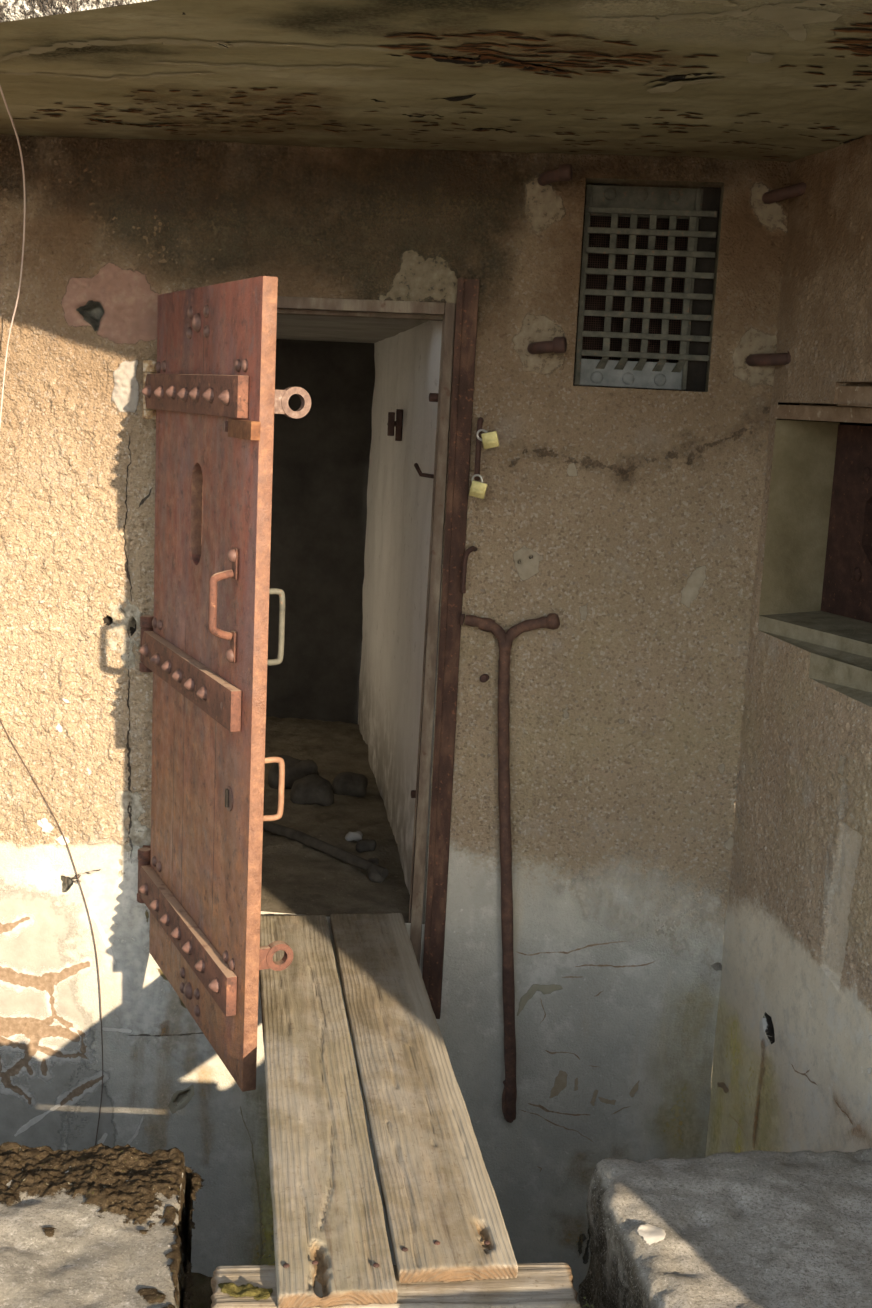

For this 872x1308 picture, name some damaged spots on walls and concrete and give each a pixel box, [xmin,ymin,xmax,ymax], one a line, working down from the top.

rust [377,30,719,78]
rust [778,13,872,90]
rust [12,87,609,152]
spalling [379,250,458,303]
crack [61,435,153,893]
peeling [0,880,116,1151]
crack [518,941,653,1067]
crack [522,1103,630,1143]